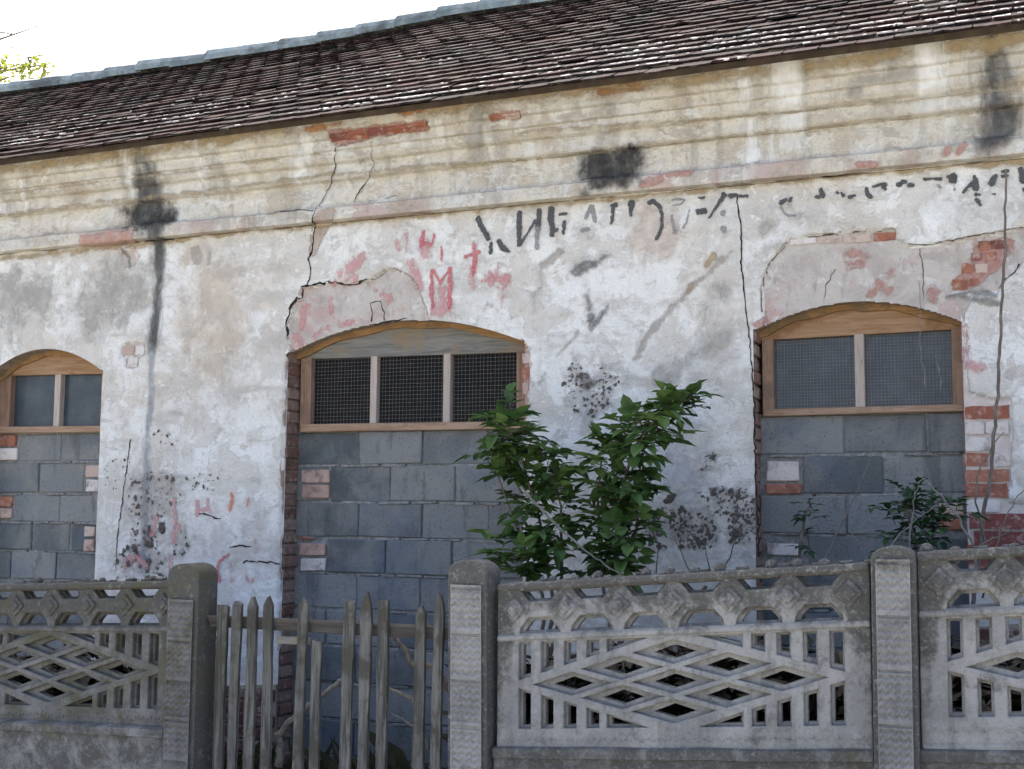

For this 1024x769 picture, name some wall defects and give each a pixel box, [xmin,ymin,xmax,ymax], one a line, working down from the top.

leakage [0,127,344,375]
crack [266,143,424,340]
spalling [329,120,429,146]
leakage [262,207,496,231]
leakage [361,32,1024,207]
peeling [283,268,429,446]
leakage [561,360,620,418]
crack [736,198,1024,557]
peeling [753,228,1024,569]
crack [114,439,131,574]
leakage [105,458,219,580]